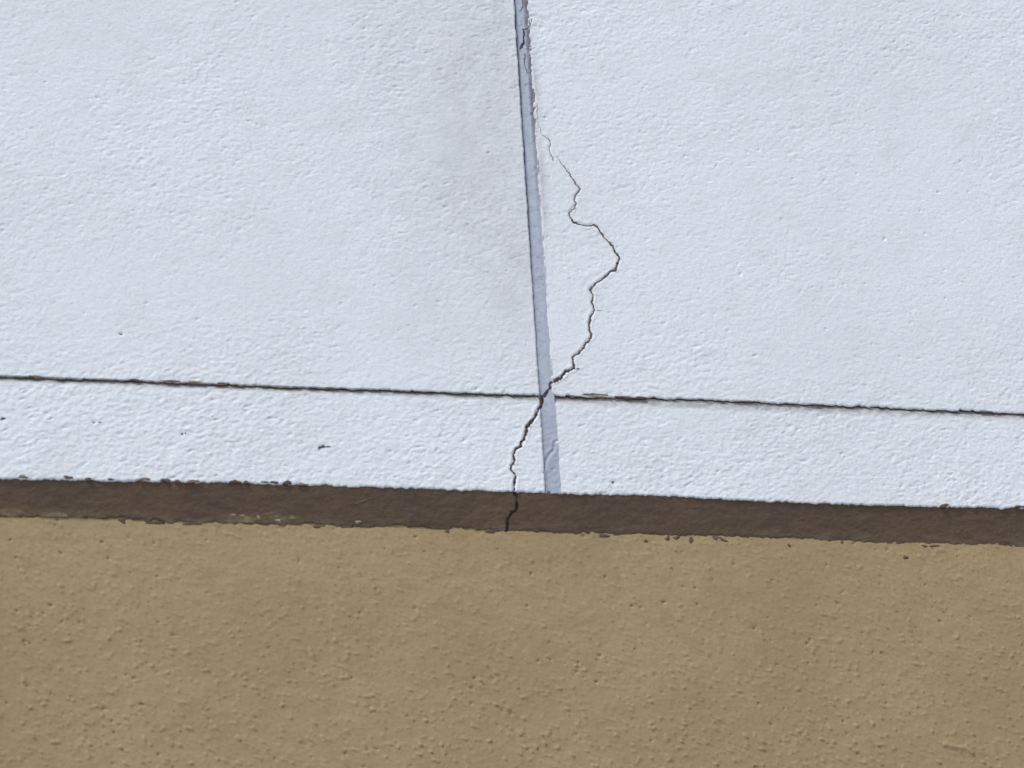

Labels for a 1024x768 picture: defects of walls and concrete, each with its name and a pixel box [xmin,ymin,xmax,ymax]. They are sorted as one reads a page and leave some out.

crack [504,0,620,532]